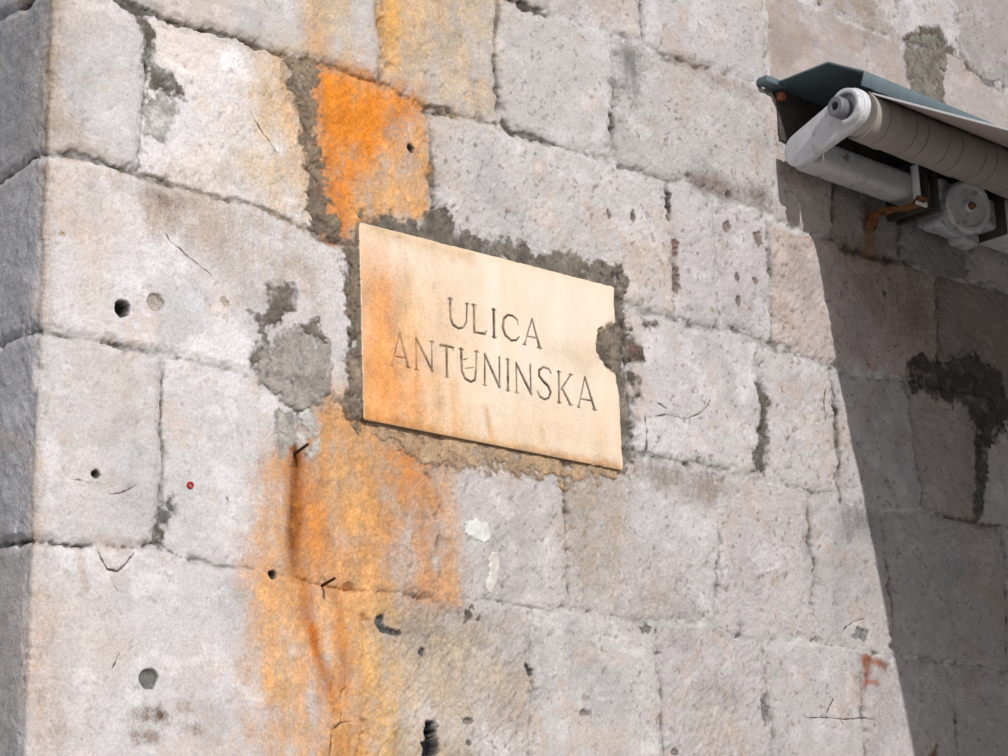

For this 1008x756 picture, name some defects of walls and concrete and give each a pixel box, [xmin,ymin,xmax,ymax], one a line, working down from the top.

corrosion [206,0,623,756]
peeling [464,518,500,594]
crack [329,688,348,754]